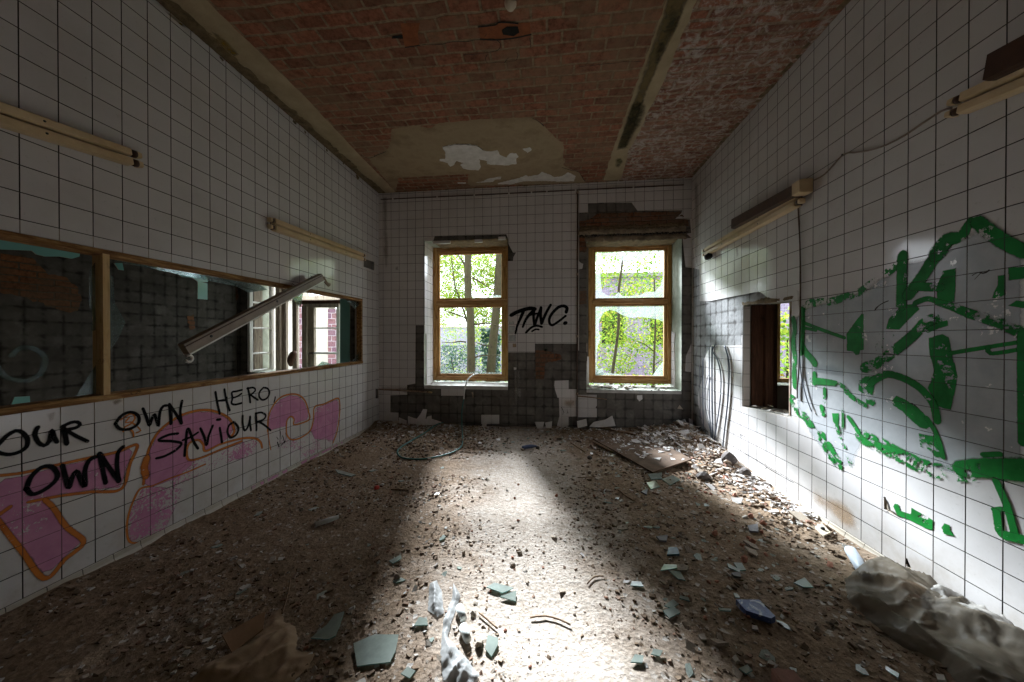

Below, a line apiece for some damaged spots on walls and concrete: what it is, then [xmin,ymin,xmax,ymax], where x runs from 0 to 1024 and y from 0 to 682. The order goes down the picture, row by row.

peeling [432,144,576,191]
spalling [375,203,766,435]